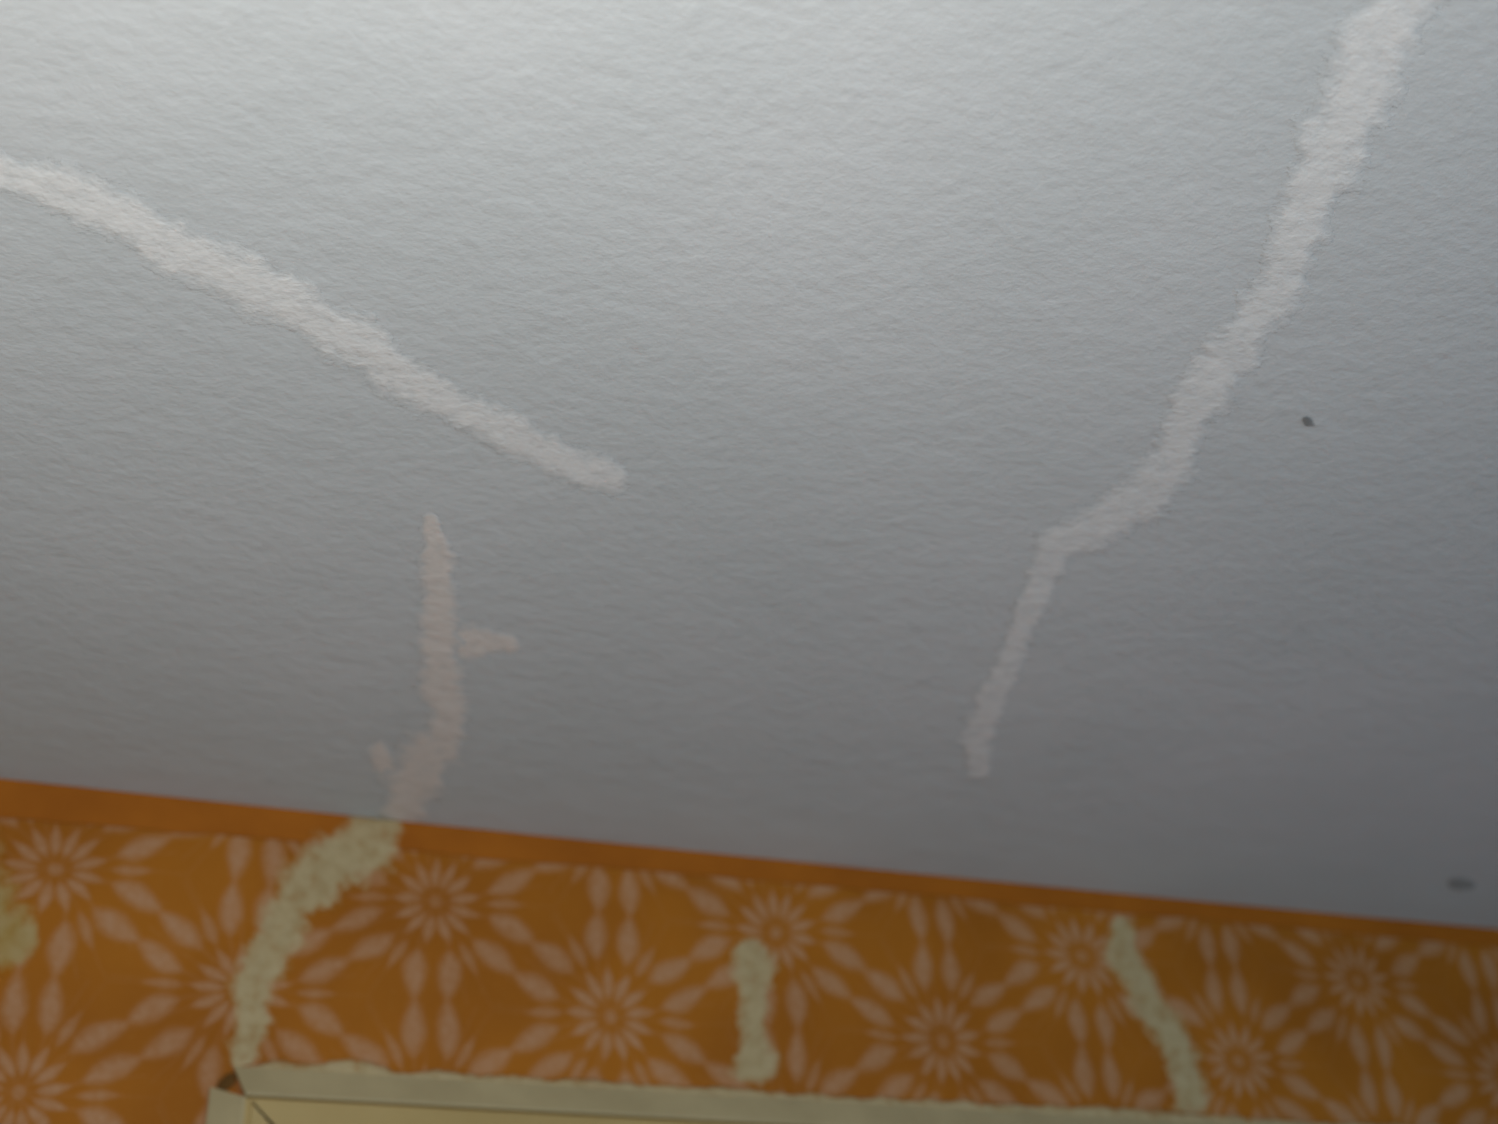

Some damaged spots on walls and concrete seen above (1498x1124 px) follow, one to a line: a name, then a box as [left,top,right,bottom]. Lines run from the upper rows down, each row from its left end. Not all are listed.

crack [0,150,630,497]
crack [953,0,1450,778]
crack [0,822,41,978]
crack [220,514,522,1069]
crack [719,936,785,1088]
crack [1099,915,1216,1115]